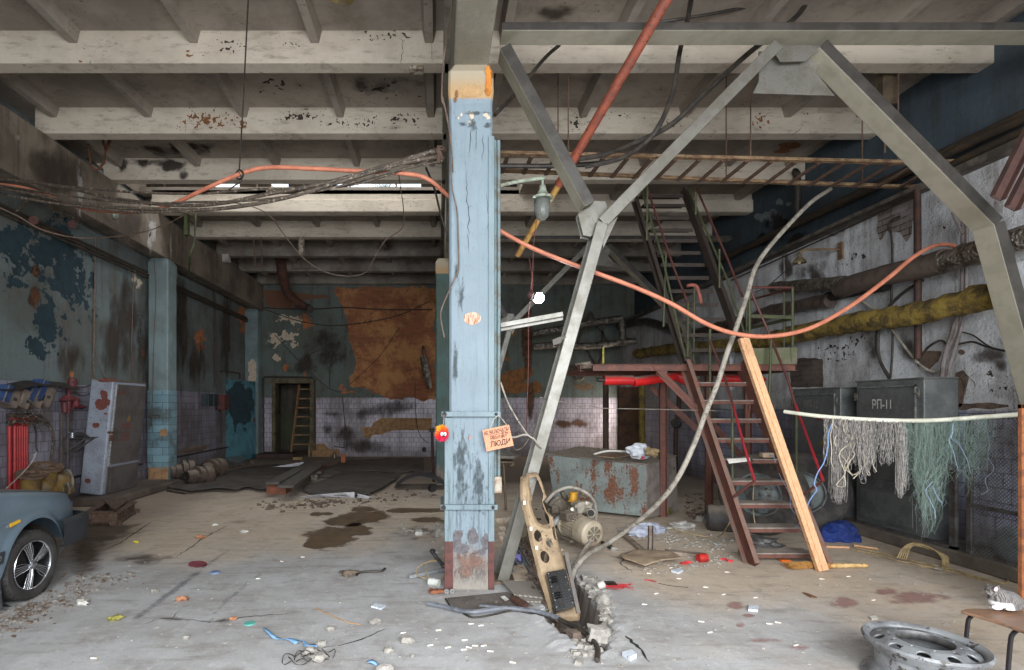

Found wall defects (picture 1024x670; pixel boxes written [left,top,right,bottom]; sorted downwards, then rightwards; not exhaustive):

crack [466,130,488,248]
flaking render [876,199,913,242]
peeling [0,210,99,361]
peeling [268,313,314,372]
flaking render [334,286,436,402]